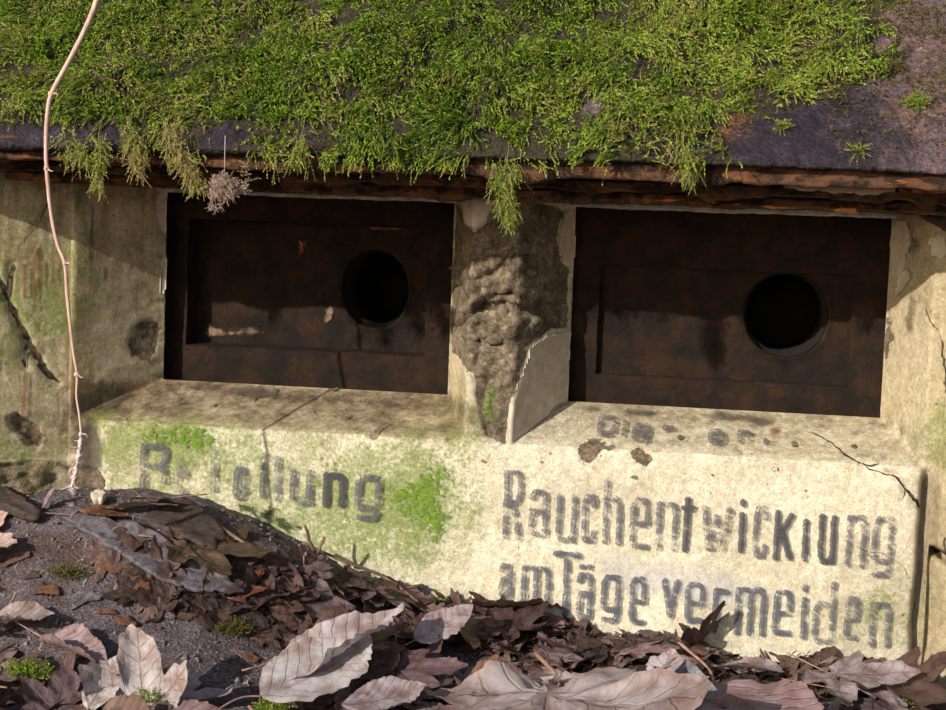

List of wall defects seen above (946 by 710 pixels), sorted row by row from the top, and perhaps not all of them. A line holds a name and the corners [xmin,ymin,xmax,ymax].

crack [0,202,59,383]
spalling [128,321,159,360]
spalling [448,200,576,444]
crack [925,308,946,393]
spalling [10,415,46,446]
crack [805,430,920,508]
crack [932,536,946,559]